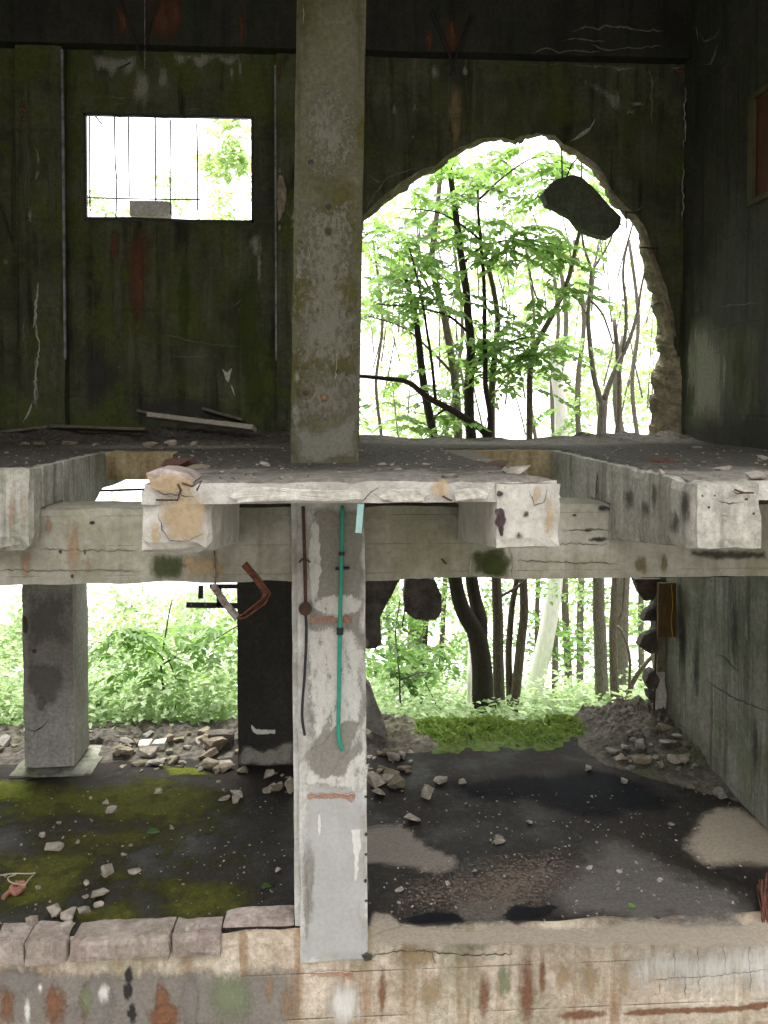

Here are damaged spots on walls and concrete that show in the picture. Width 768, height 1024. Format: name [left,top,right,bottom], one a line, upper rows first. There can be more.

crack [532,25,664,124]
spalling [625,211,677,338]
damp [625,486,655,511]
damp [671,496,688,532]
damp [28,666,62,710]
corrosion [46,986,65,1024]
corrosion [124,967,137,1022]
corrosion [150,985,178,1024]
crack [373,950,510,964]
corrosion [480,981,489,1013]
corrosion [519,961,545,1015]
crack [656,945,760,997]